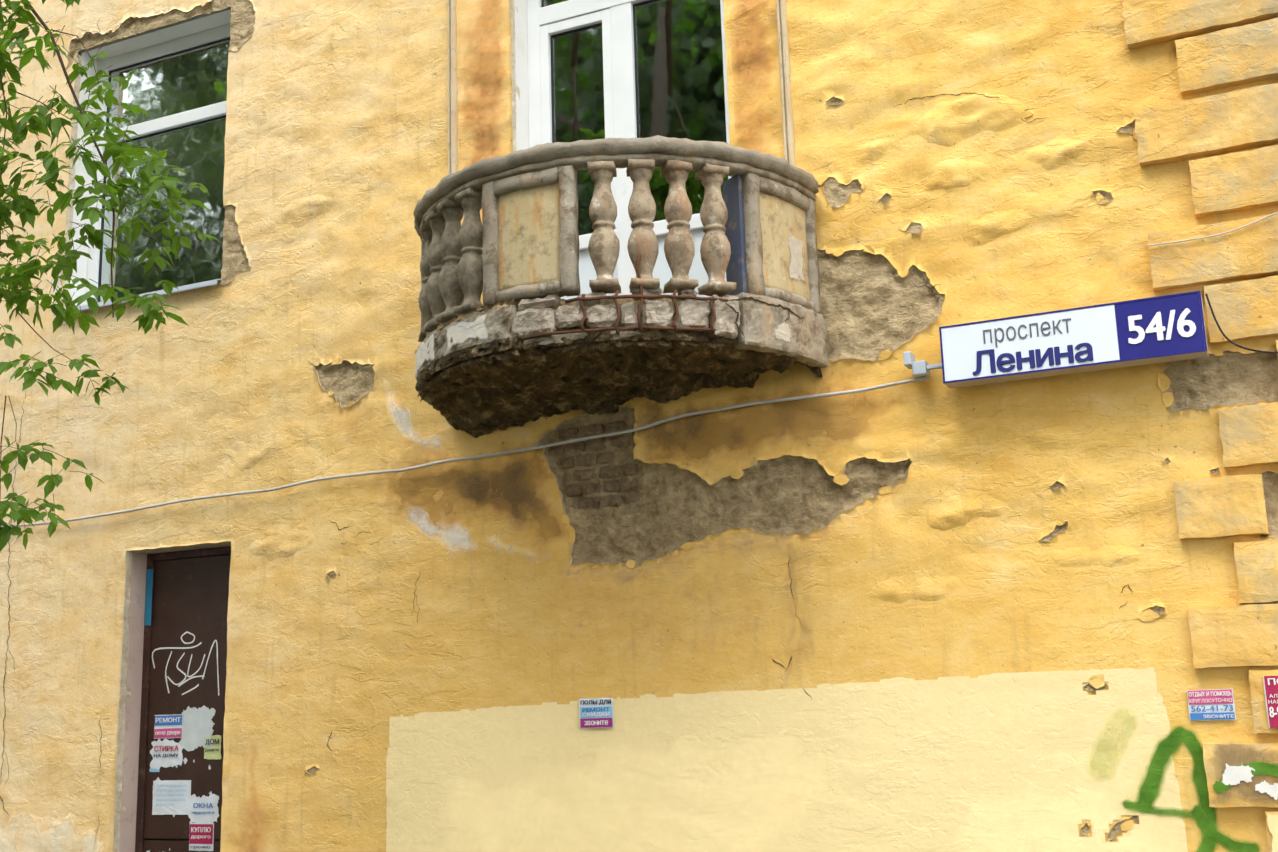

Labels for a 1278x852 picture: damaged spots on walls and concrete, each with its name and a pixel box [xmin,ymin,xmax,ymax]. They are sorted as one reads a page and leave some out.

spalling [67,0,256,68]
crack [893,92,1049,123]
spalling [218,204,250,285]
spalling [788,236,945,362]
spalling [309,356,375,408]
spalling [1157,350,1278,412]
damp [394,456,561,549]
spalling [537,407,912,568]
spalling [1259,471,1278,539]